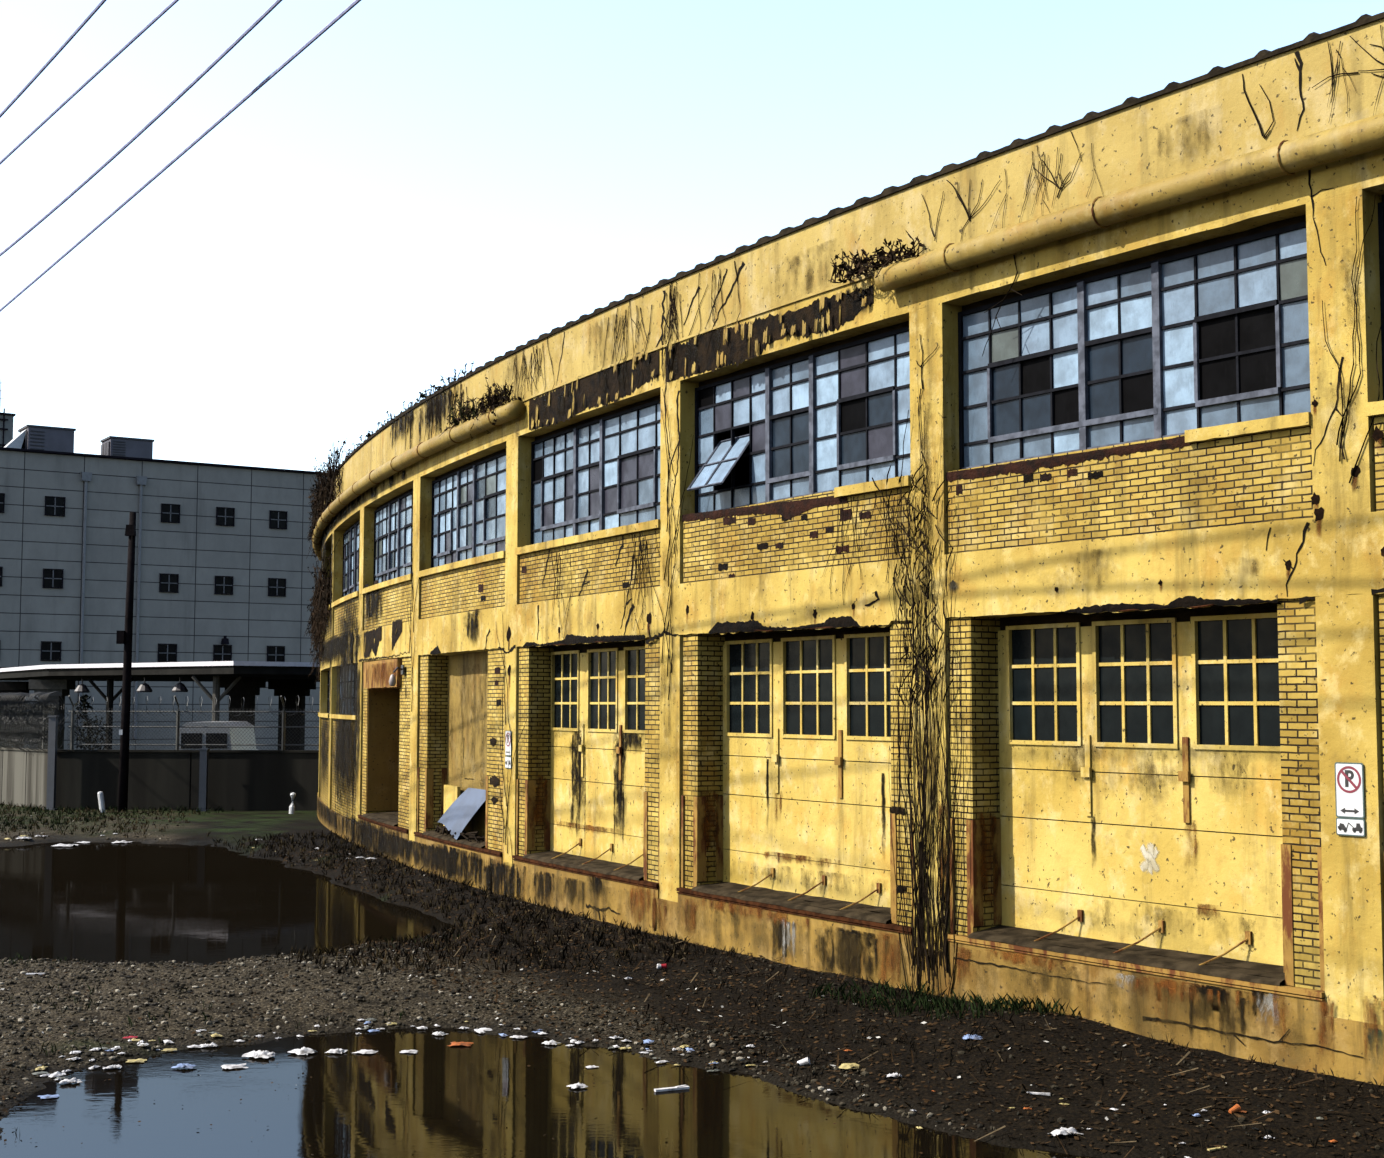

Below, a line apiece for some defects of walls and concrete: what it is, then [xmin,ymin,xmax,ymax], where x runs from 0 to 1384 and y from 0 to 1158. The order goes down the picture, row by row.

flaking render [529,285,874,431]
leakage [317,470,605,902]
leakage [613,733,641,836]
corrosion [630,886,666,925]
corrosion [685,900,786,926]
corrosion [1318,997,1334,1046]
corrosion [1364,999,1378,1047]